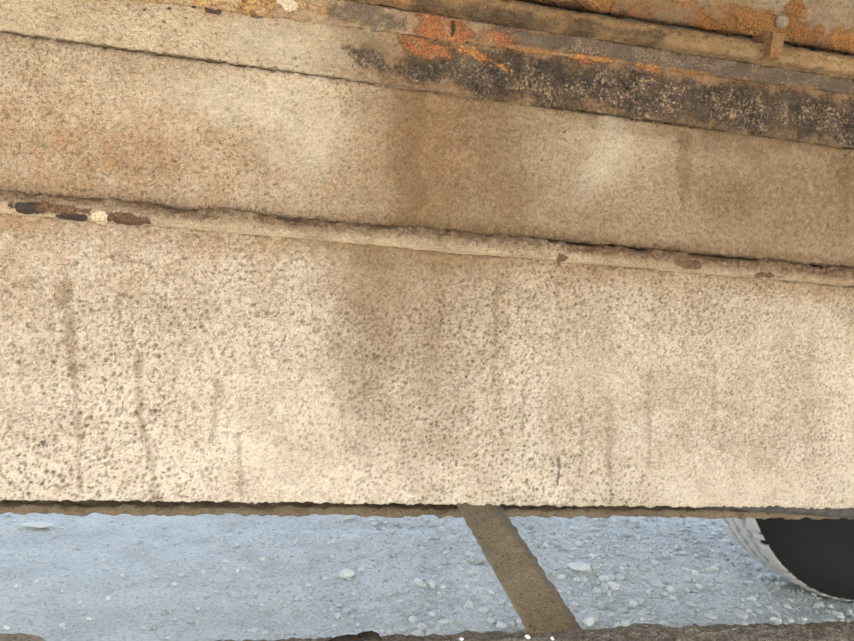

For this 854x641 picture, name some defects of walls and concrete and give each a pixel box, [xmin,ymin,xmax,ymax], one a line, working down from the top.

rust [398,12,613,72]
rust [564,0,616,15]
rust [624,62,711,77]
rust [689,0,854,55]